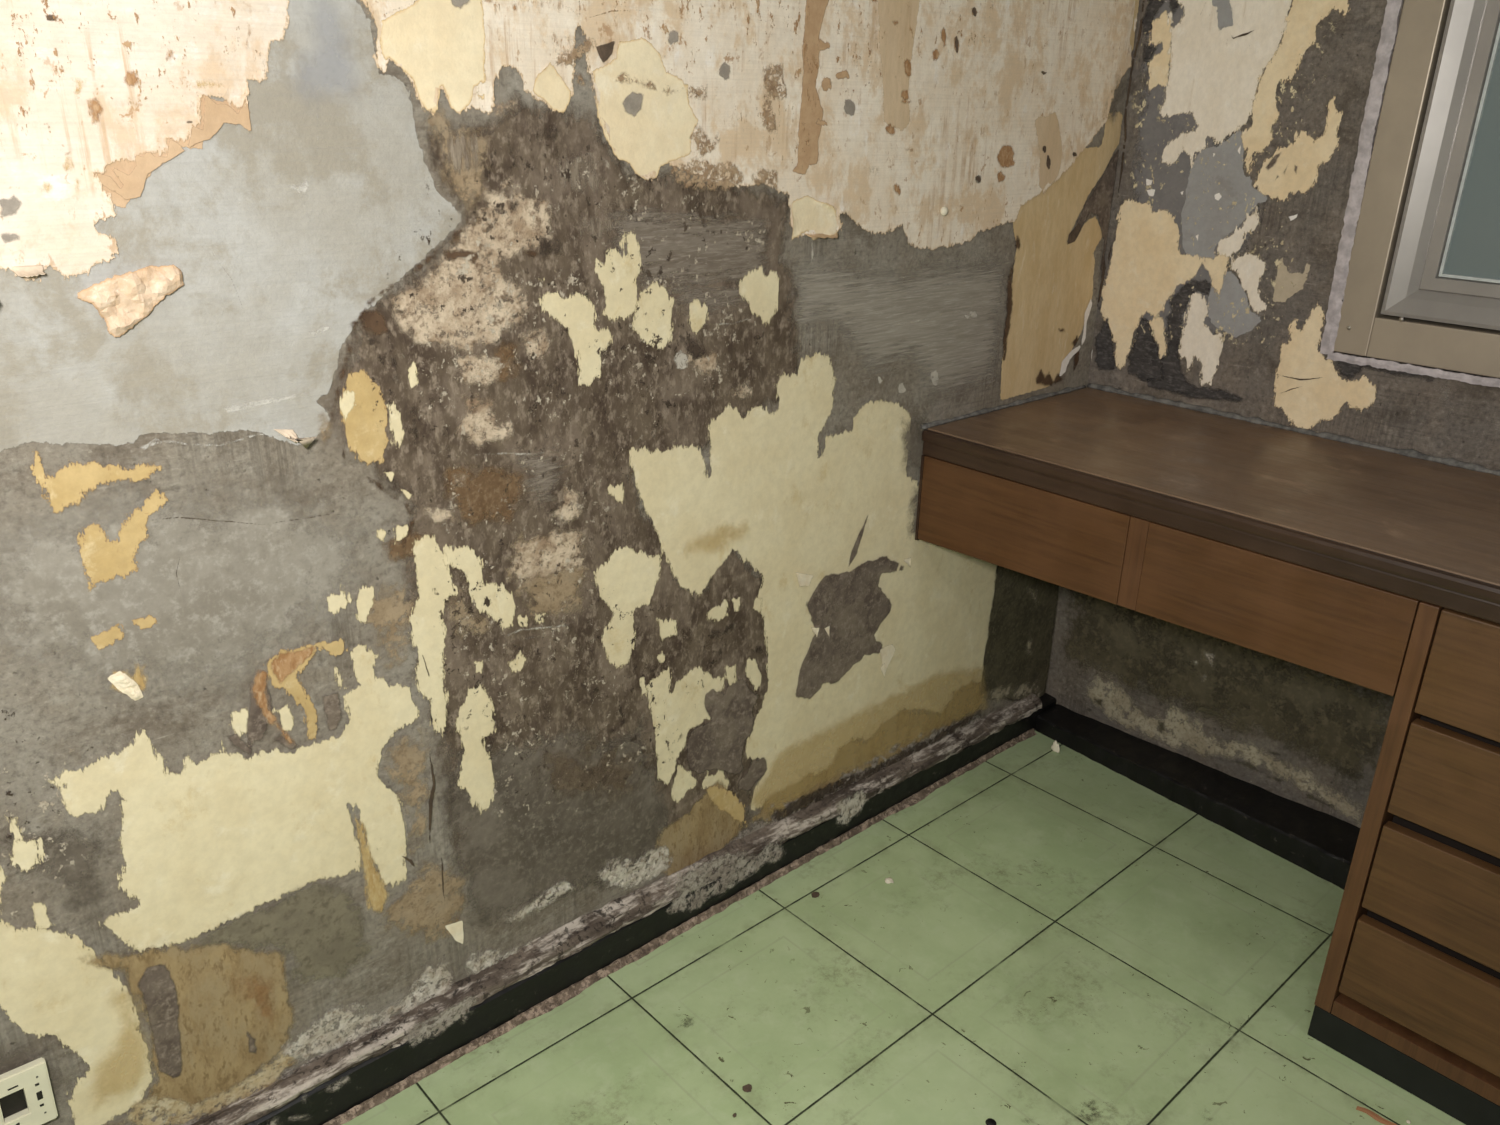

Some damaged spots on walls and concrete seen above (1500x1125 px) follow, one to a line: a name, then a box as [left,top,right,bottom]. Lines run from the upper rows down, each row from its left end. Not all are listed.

peeling [1059,0,1376,429]
peeling [0,0,1042,1125]
damp [91,98,1389,1125]
damp [0,1049,36,1075]
damp [5,830,104,916]
damp [48,1069,62,1096]